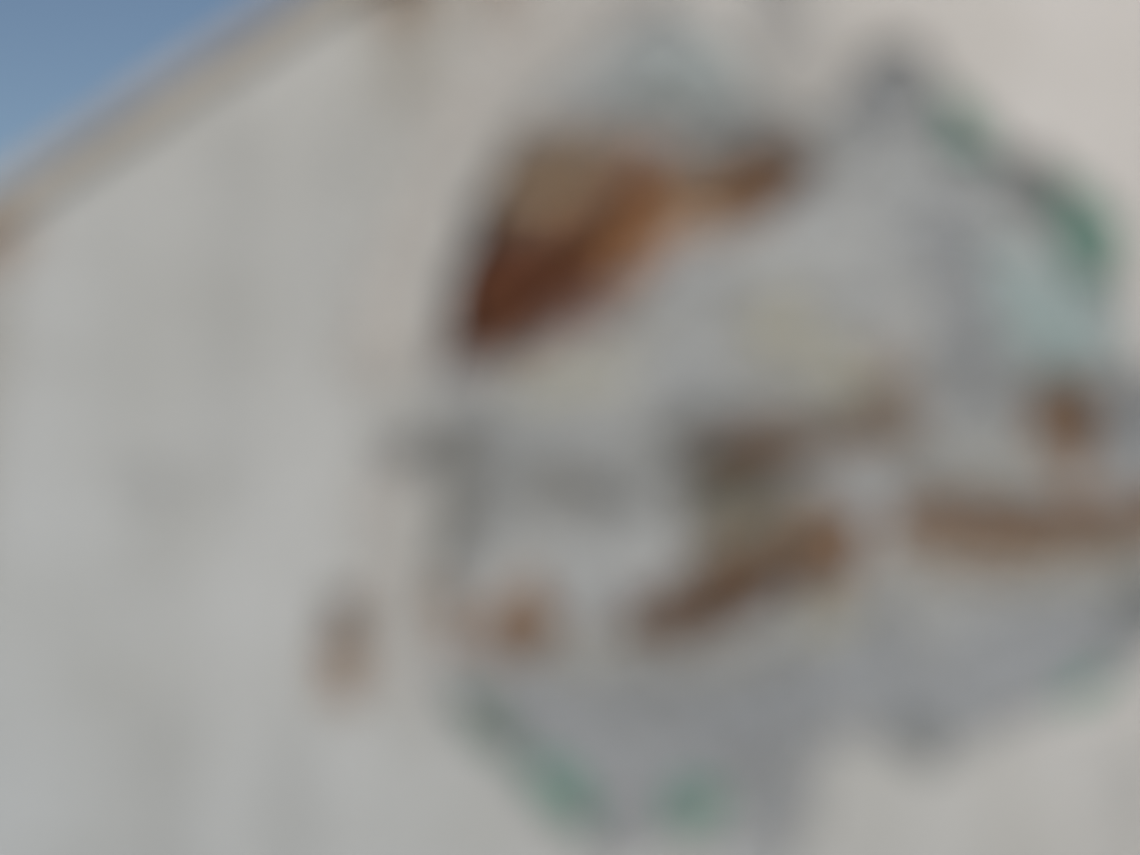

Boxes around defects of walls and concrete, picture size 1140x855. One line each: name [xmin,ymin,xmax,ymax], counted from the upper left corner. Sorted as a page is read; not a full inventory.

corrosion [445,129,736,364]
spalling [423,1,1140,855]